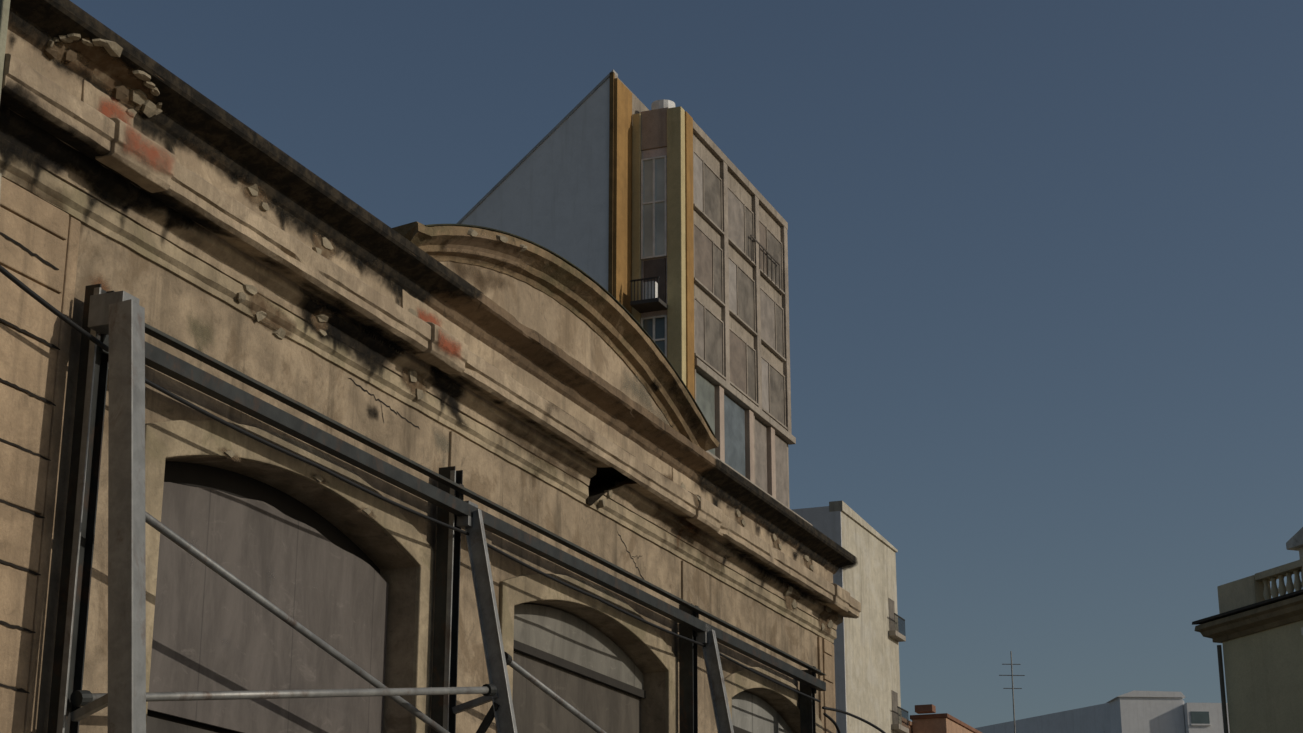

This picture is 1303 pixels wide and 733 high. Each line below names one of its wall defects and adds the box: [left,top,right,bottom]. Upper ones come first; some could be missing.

spalling [44,33,162,118]
water stain [9,0,493,305]
crack [348,378,419,428]
spalling [586,467,628,508]
water stain [699,459,858,572]